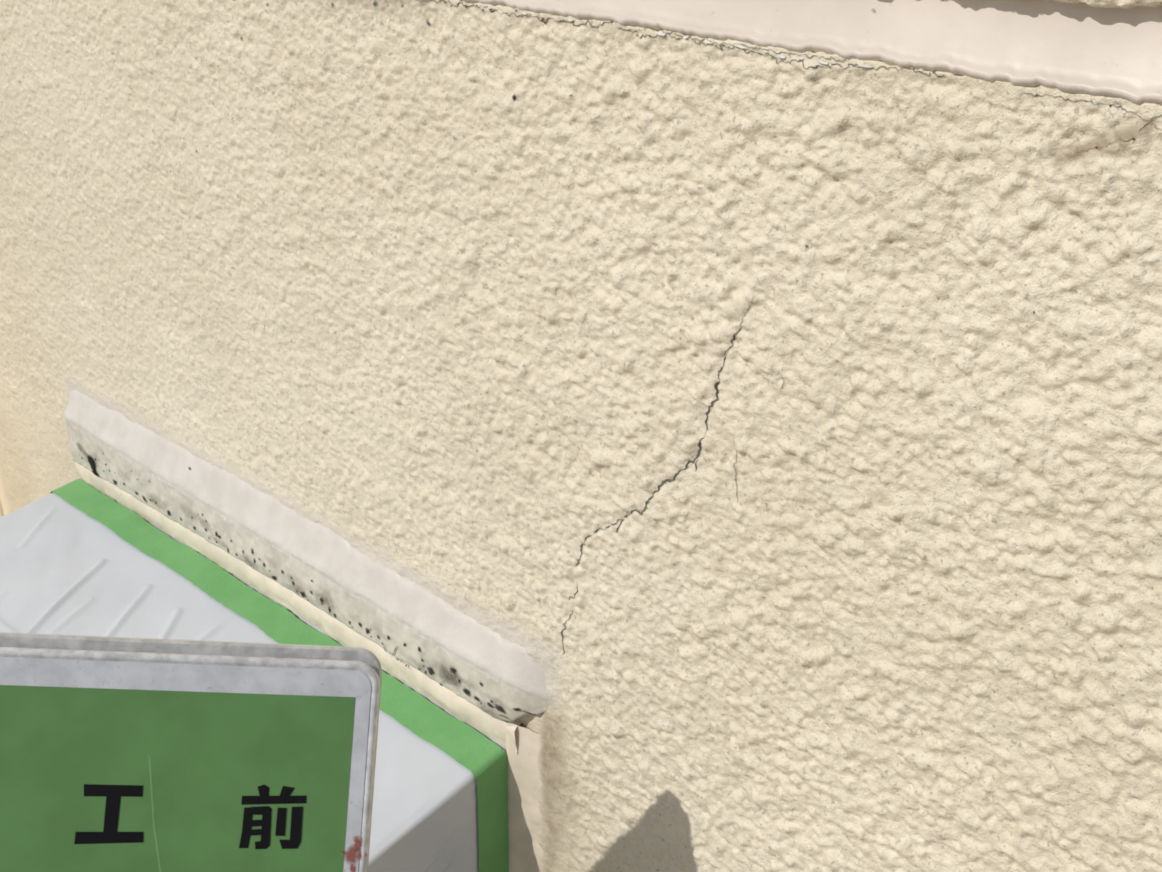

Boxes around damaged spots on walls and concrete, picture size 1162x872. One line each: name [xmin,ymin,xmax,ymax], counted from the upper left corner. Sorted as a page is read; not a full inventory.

water stain [79,454,336,618]
crack [561,295,757,654]
water stain [403,643,521,713]